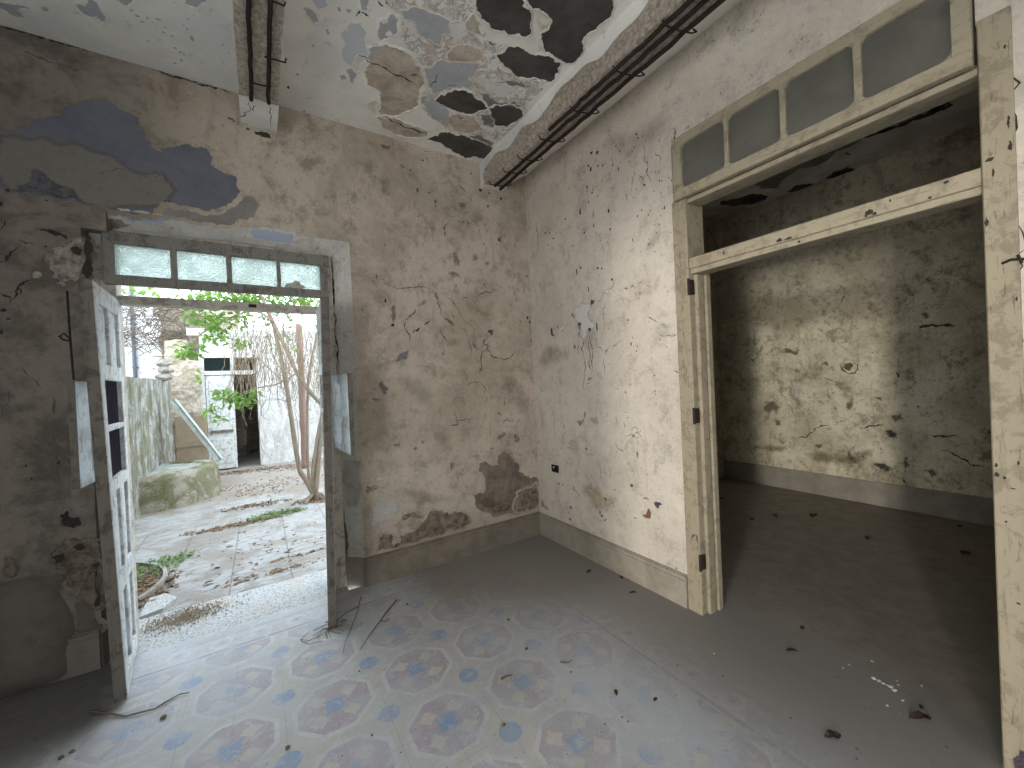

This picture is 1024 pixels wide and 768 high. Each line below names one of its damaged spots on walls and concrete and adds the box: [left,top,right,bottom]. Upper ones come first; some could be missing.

spalling [222,0,287,106]
peeling [299,0,726,207]
peeling [0,93,297,246]
flaking render [26,225,96,296]
crack [376,277,513,422]
crack [577,304,606,384]
crack [931,435,984,467]
flaking render [375,508,473,553]
flaking render [512,481,539,514]